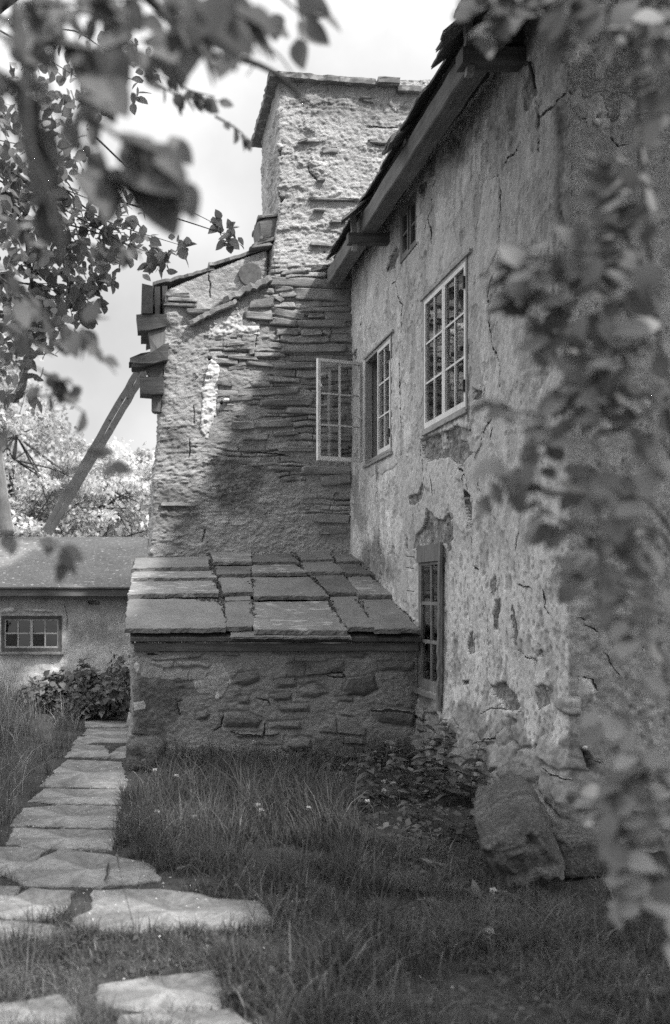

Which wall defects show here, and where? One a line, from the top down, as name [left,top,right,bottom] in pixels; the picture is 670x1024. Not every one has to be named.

crack [487,92,568,387]
flaking render [419,419,484,470]
flaking render [406,484,472,553]
flaking render [489,682,522,716]
flaking render [533,679,553,709]